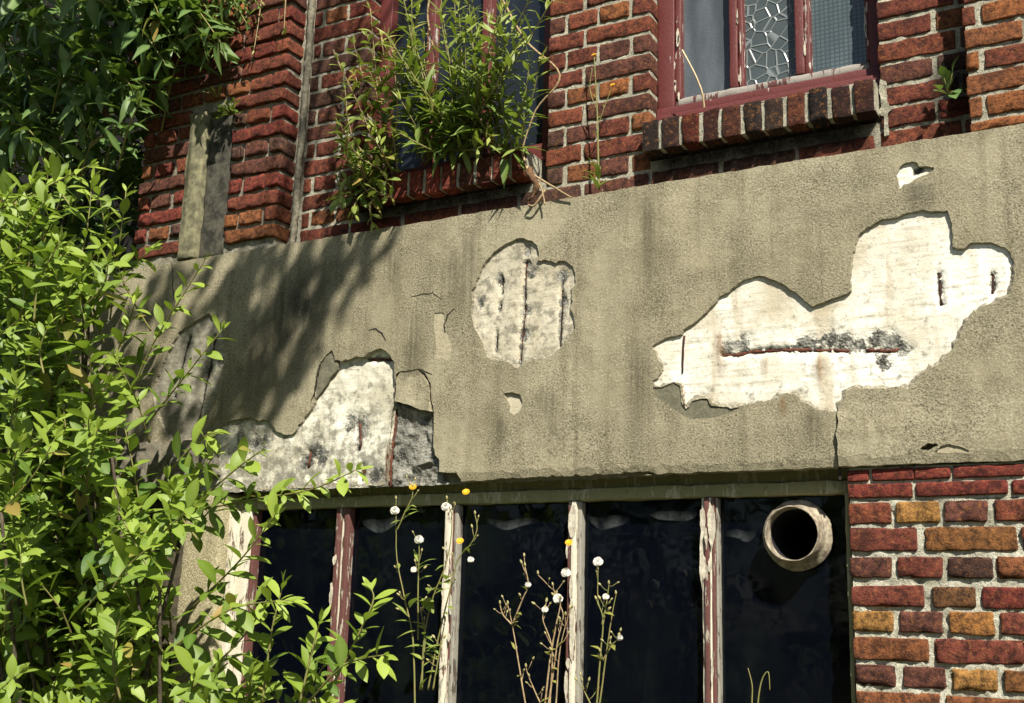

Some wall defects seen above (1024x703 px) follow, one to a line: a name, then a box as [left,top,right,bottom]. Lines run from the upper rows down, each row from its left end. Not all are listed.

spalling [897,162,934,189]
spalling [471,238,576,368]
spalling [652,210,1015,419]
spalling [200,349,467,493]
spalling [505,393,523,415]